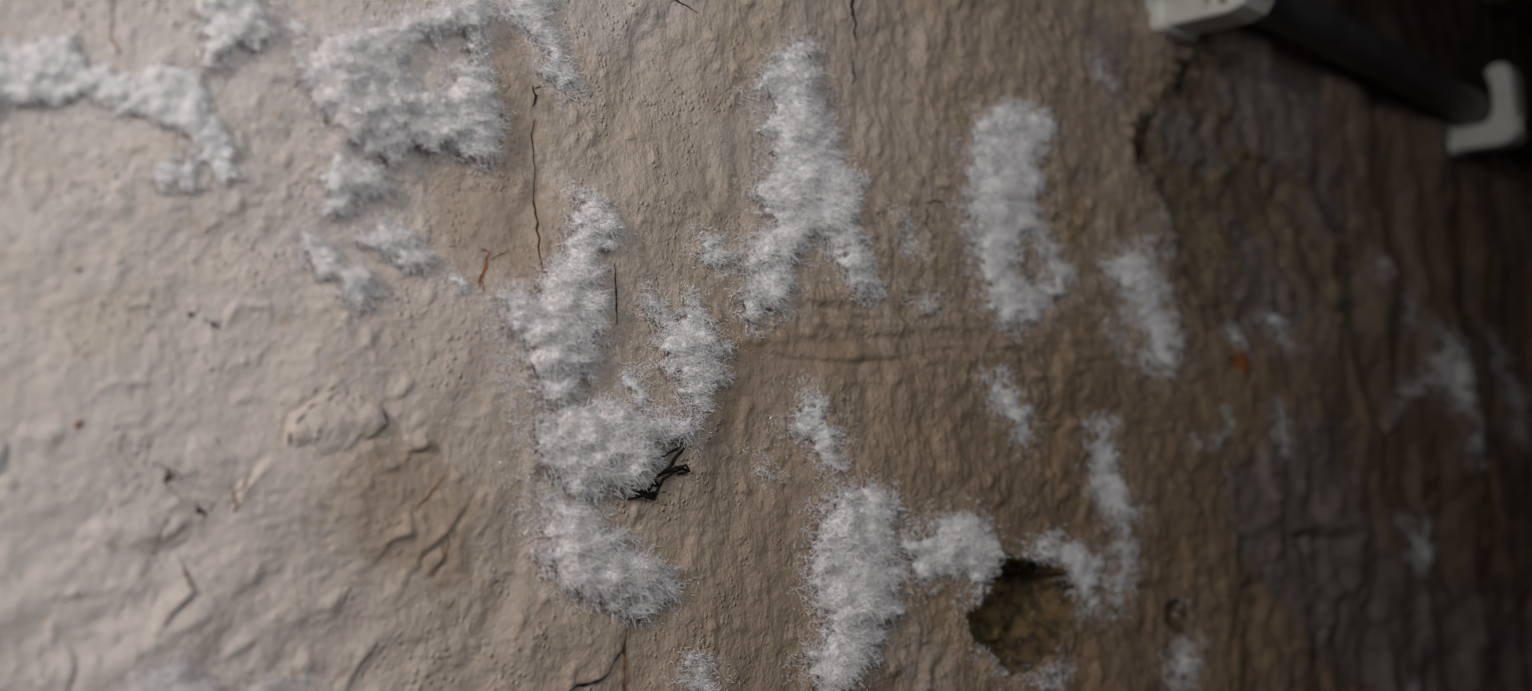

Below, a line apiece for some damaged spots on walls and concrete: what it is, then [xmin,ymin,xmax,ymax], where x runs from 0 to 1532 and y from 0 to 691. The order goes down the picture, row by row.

water stain [0,0,1195,691]
crack [571,643,625,691]
spalling [966,552,1075,676]
water stain [1149,593,1223,691]